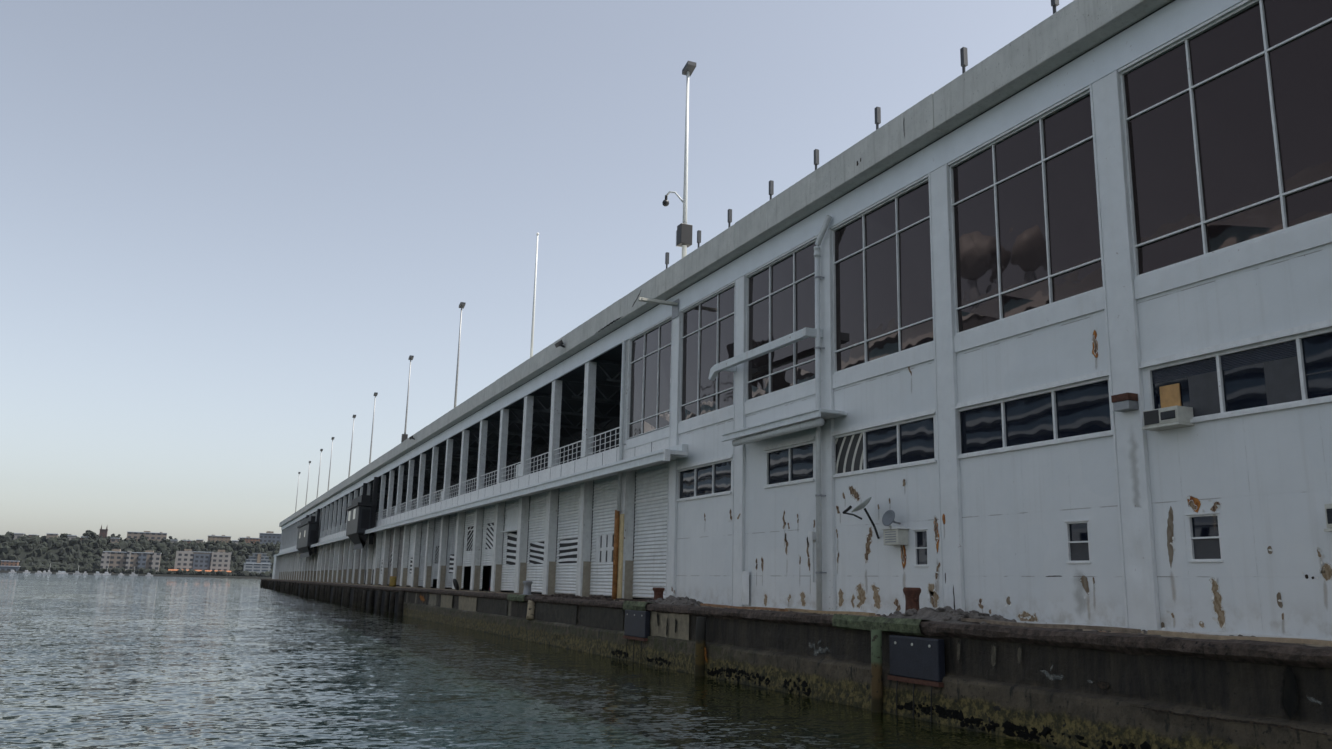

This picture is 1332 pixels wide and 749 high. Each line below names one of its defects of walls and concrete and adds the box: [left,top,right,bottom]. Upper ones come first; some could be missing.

peeling [835,485,861,563]
peeling [863,526,873,564]
peeling [1167,506,1175,566]
peeling [836,580,901,613]
peeling [926,562,940,609]
peeling [1080,575,1095,599]
peeling [1199,577,1226,630]